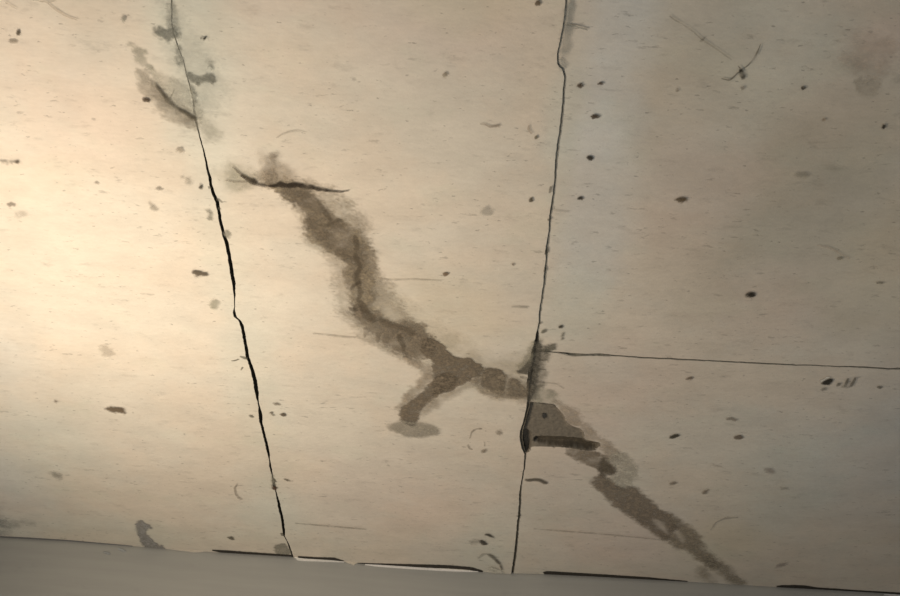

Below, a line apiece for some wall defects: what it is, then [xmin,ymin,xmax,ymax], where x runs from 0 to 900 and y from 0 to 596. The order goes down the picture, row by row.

crack [156,0,293,556]
crack [234,168,347,193]
damp [262,170,528,437]
spalling [520,401,600,453]
damp [567,445,744,584]
crack [511,0,900,573]